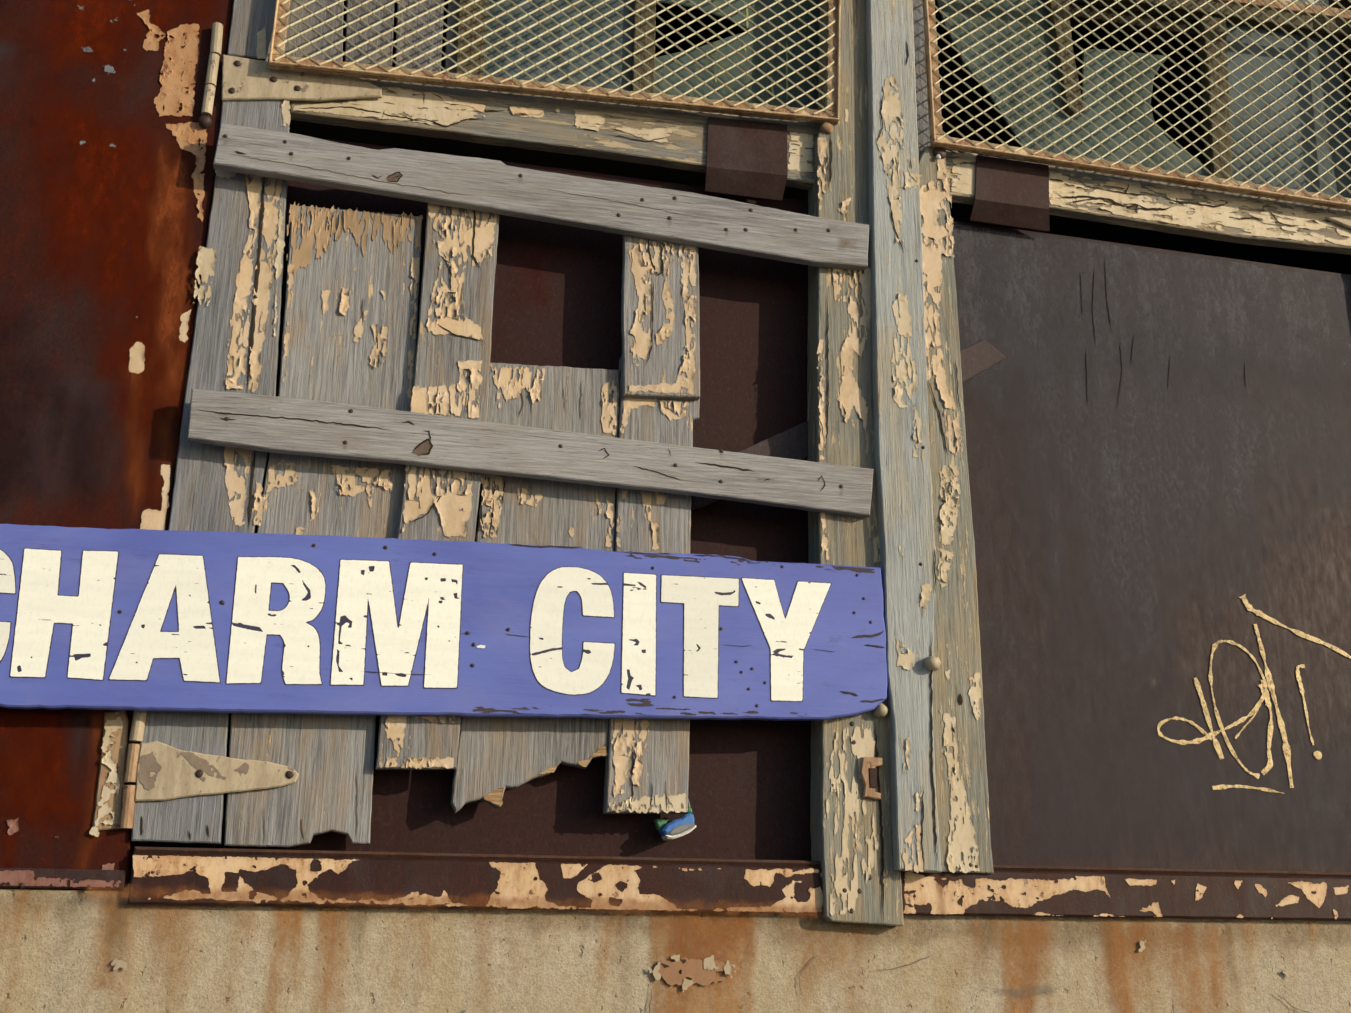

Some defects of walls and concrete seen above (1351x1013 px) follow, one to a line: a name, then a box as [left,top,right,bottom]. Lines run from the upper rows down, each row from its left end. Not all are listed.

rust [45,0,210,69]
rust [36,102,193,459]
peeling [134,4,546,418]
peeling [601,239,697,436]
peeling [817,268,871,463]
peeling [876,74,977,616]
peeling [1049,171,1351,246]
peeling [331,465,543,539]
peeling [0,855,697,911]
peeling [578,718,687,814]
rust [667,908,749,1013]
peeling [902,709,1110,916]